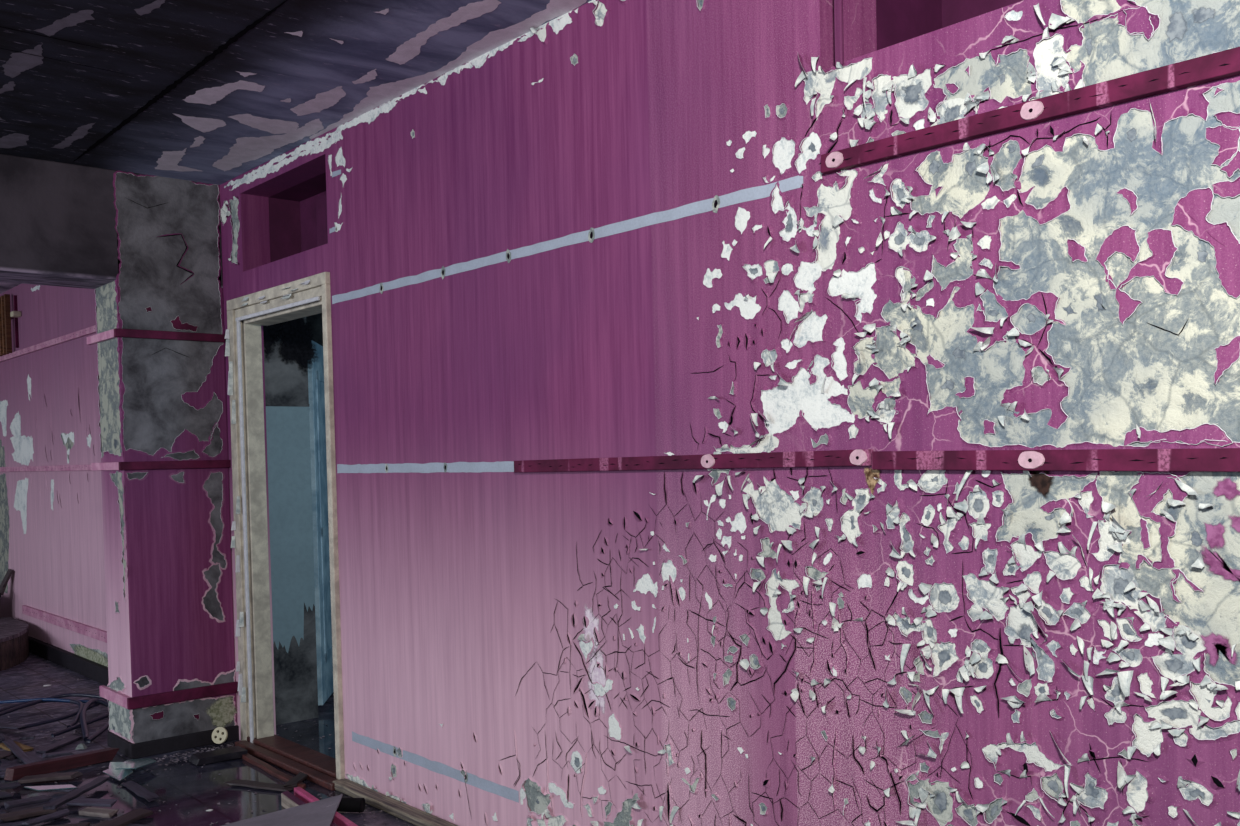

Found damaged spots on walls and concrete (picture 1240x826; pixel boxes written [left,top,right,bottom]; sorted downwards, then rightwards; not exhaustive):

crack [972,264,998,282]
spalling [61,0,631,637]
peeling [693,0,1240,826]
peeling [614,530,689,645]
crack [498,279,1095,826]
peeling [577,634,594,663]
spalling [107,661,246,743]
crack [352,732,489,826]
peeling [570,750,583,775]
peeling [608,712,632,753]
crack [1078,743,1148,820]
crack [1101,698,1144,709]